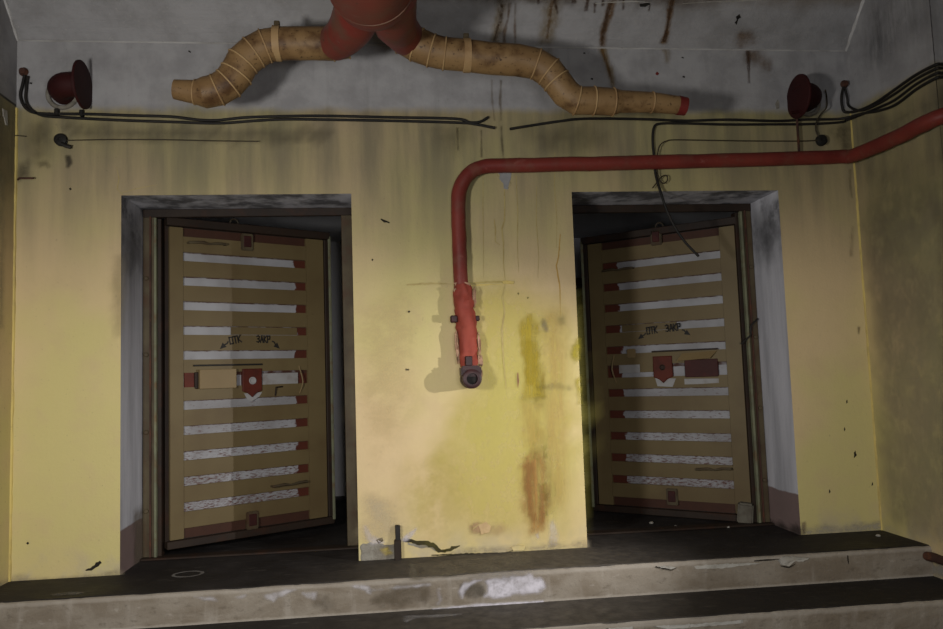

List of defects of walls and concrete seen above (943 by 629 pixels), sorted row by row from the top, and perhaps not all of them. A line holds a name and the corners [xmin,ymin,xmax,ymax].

rust [572,0,624,84]
rust [661,0,675,43]
water stain [460,301,562,512]
rust [523,453,547,530]
crack [404,538,513,556]